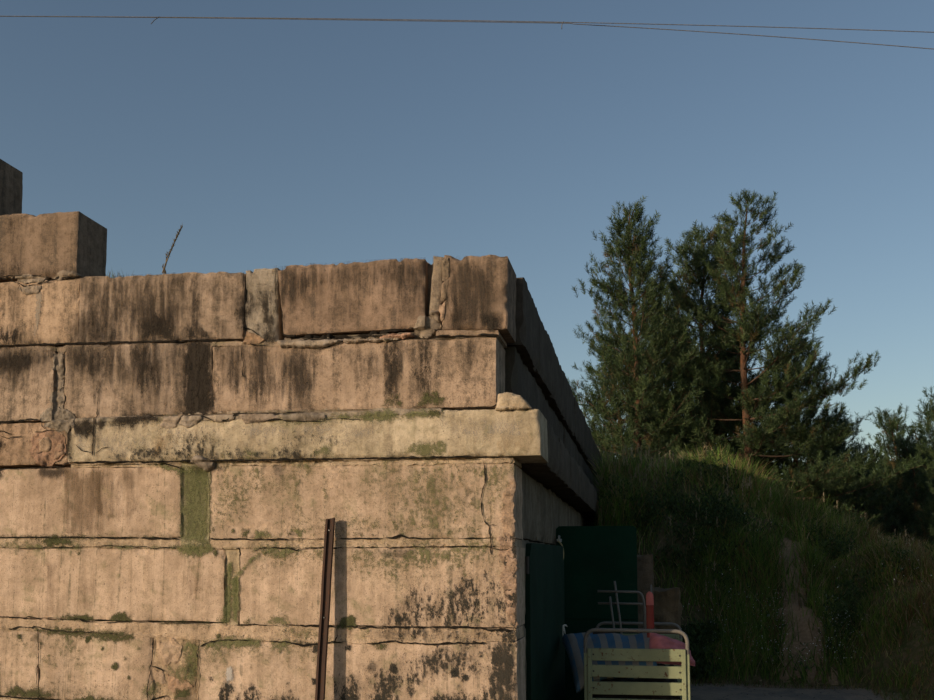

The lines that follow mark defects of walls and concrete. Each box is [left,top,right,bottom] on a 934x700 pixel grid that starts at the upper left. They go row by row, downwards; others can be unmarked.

water stain [445,258,500,332]
water stain [0,328,51,377]
water stain [130,277,216,416]
water stain [234,287,284,395]
water stain [283,354,309,410]
water stain [380,339,439,403]
crack [449,403,531,412]
water stain [39,412,332,515]
crack [0,397,512,556]
water stain [332,535,517,700]
water stain [209,667,299,700]